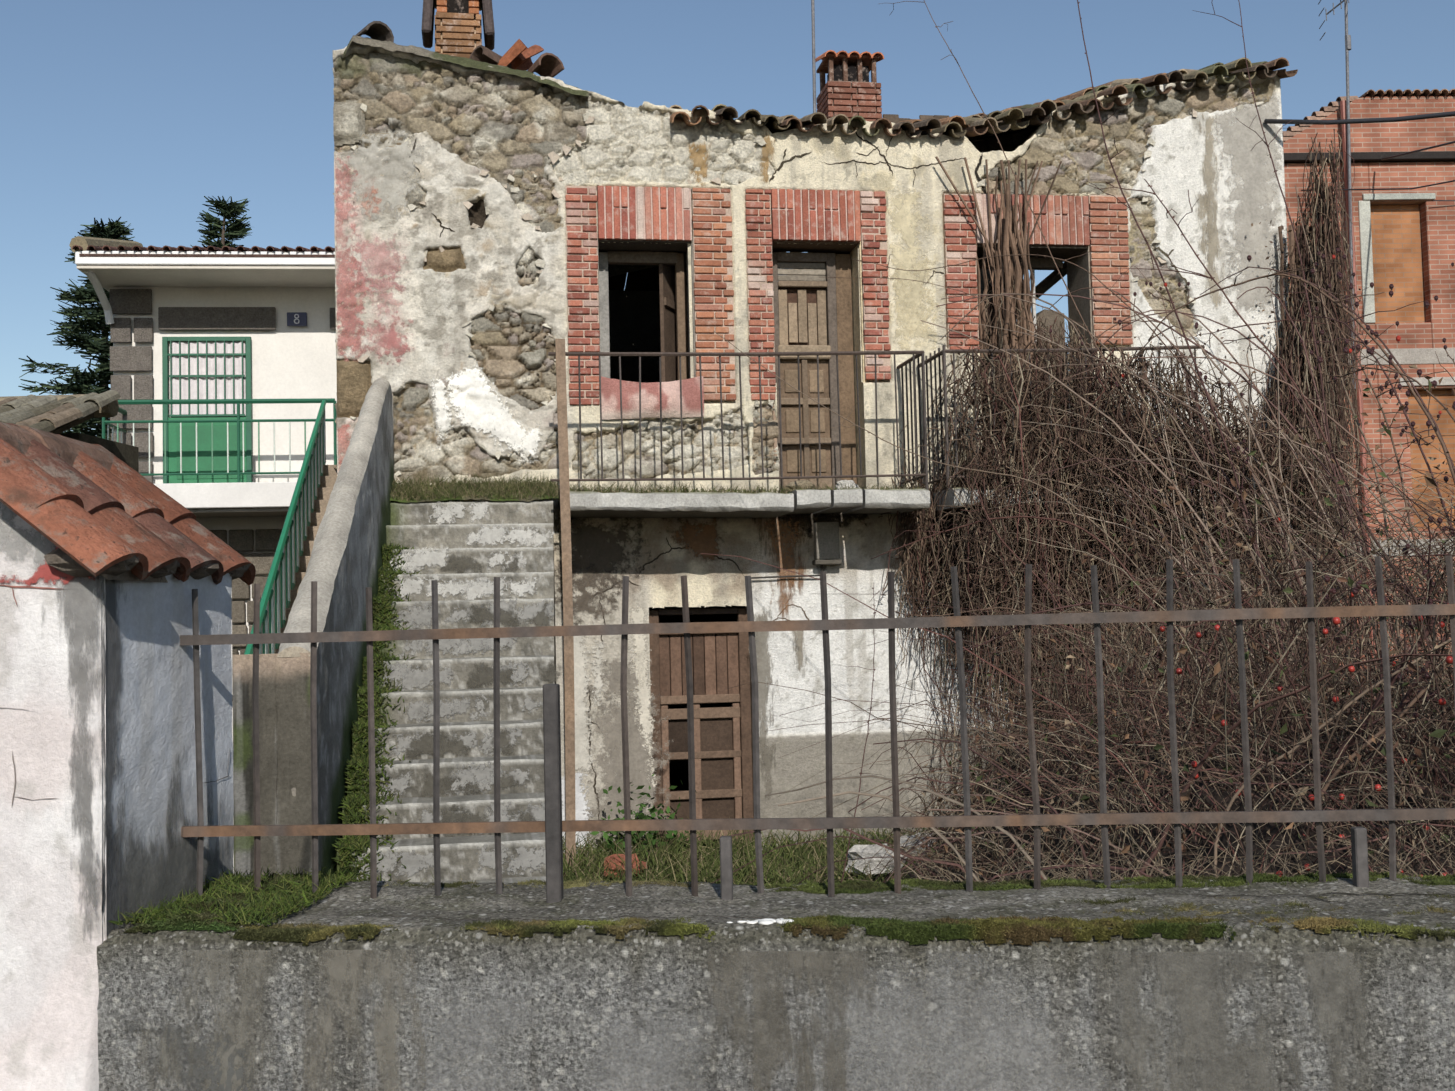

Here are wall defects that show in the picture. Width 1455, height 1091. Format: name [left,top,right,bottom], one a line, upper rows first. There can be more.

flaking render [423,246,466,272]
flaking render [516,247,546,287]
flaking render [333,50,775,233]
flaking render [977,79,1286,338]
damp [1196,114,1222,306]
flaking render [393,304,779,485]
peeling [0,547,95,586]
damp [0,502,229,936]
peeling [382,501,565,875]
flaking render [573,636,607,773]
flaking render [630,606,657,787]
peeling [353,850,434,880]